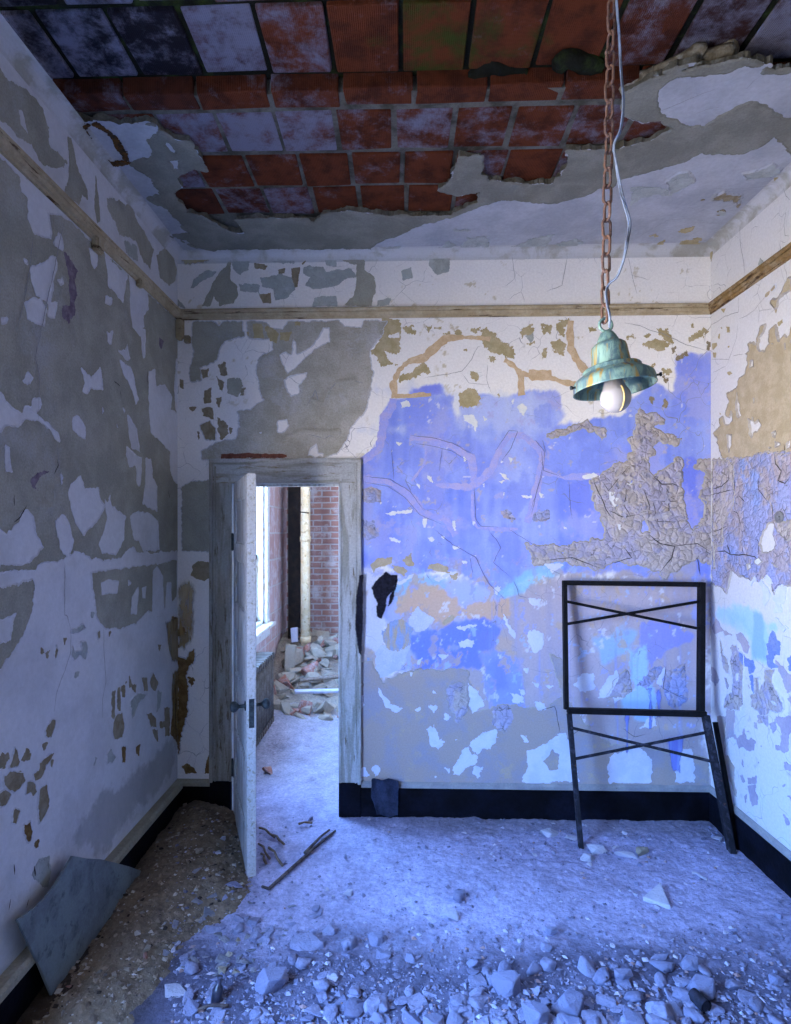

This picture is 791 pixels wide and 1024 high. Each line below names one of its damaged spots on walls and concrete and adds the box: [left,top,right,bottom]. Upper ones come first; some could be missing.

peeling [0,718,56,888]
spalling [0,0,791,806]